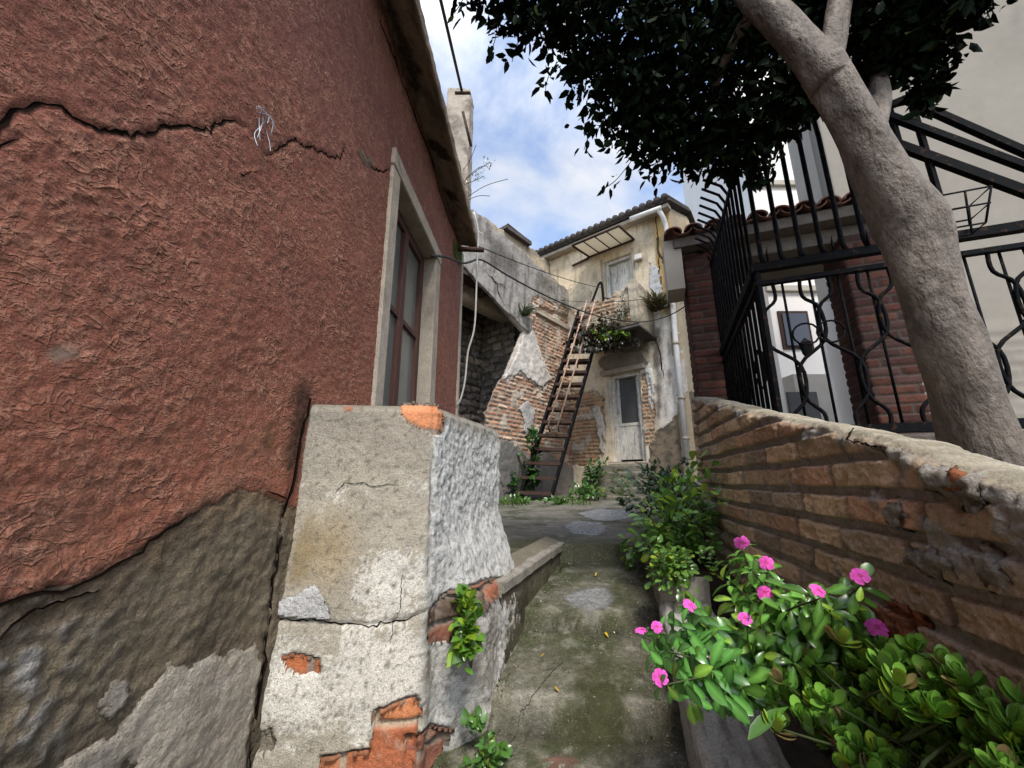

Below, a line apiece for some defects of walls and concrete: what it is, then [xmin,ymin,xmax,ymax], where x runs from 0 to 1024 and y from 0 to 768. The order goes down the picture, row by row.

crack [0,100,251,147]
crack [237,137,346,176]
spalling [483,295,606,468]
spalling [400,401,445,436]
crack [845,428,888,457]
spalling [942,465,968,492]
peeling [0,490,330,768]
crack [247,398,425,768]
spalling [427,577,510,645]
spalling [319,697,455,768]